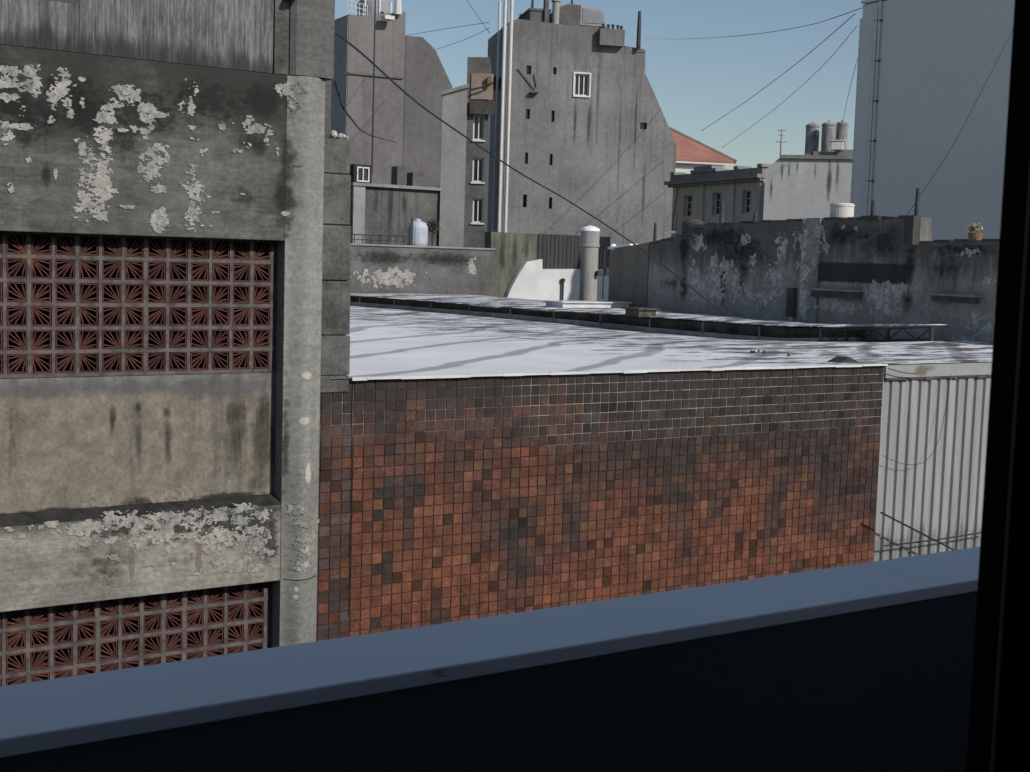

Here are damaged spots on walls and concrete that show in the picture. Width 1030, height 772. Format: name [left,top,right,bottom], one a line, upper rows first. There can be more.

peeling [0,64,86,145]
peeling [73,78,220,234]
peeling [218,115,279,156]
leakage [275,140,294,223]
peeling [347,267,427,289]
peeling [467,254,477,274]
peeling [687,214,909,322]
leakage [818,256,914,284]
peeling [948,310,995,342]
peeling [0,486,320,575]